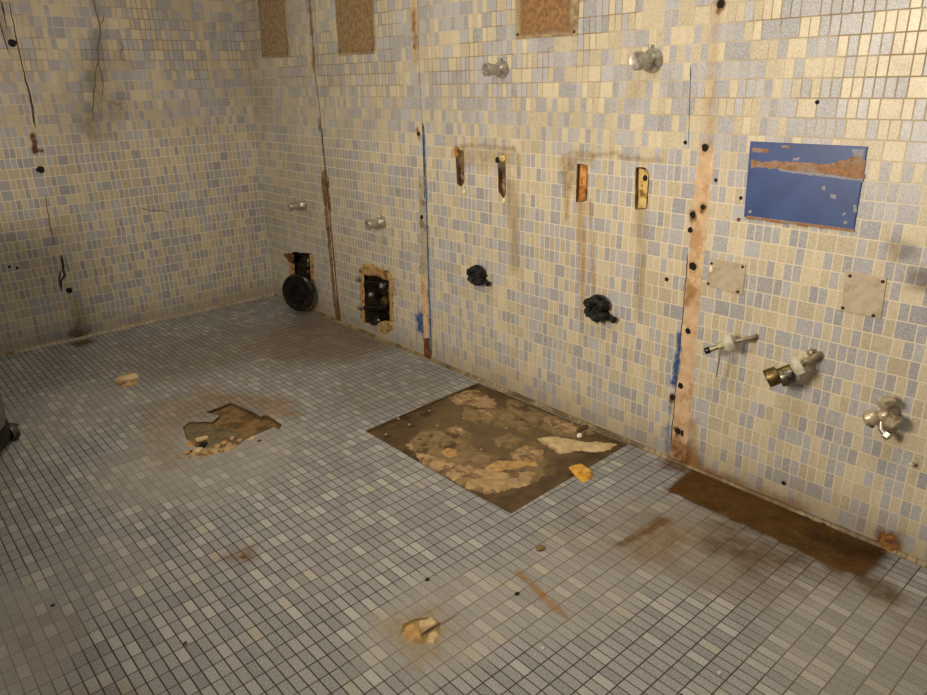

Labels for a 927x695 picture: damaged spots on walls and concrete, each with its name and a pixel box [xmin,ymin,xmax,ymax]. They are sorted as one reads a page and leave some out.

crack [0,2,36,128]
crack [91,0,125,121]
peeling [751,145,866,199]
peeling [180,403,281,458]
peeling [368,385,625,513]
spalling [393,614,458,648]